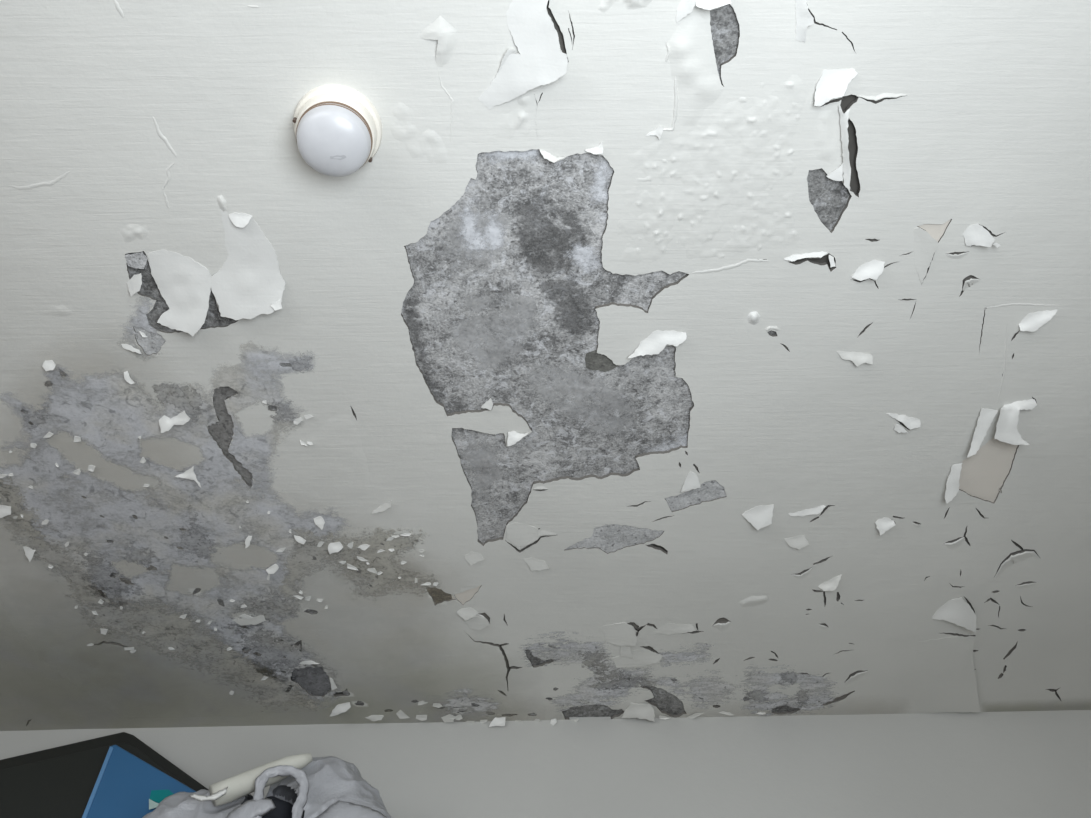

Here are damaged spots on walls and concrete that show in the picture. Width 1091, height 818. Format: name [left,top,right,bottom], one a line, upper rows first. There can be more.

peeling [478,0,568,109]
peeling [667,0,739,127]
crack [808,9,856,53]
spalling [807,68,859,231]
peeling [121,209,286,356]
spalling [401,142,694,571]
spalling [0,343,713,727]
spalling [665,471,726,511]
crack [944,508,985,549]
peeling [944,399,1037,504]
crack [965,541,1040,612]
crack [477,613,516,693]